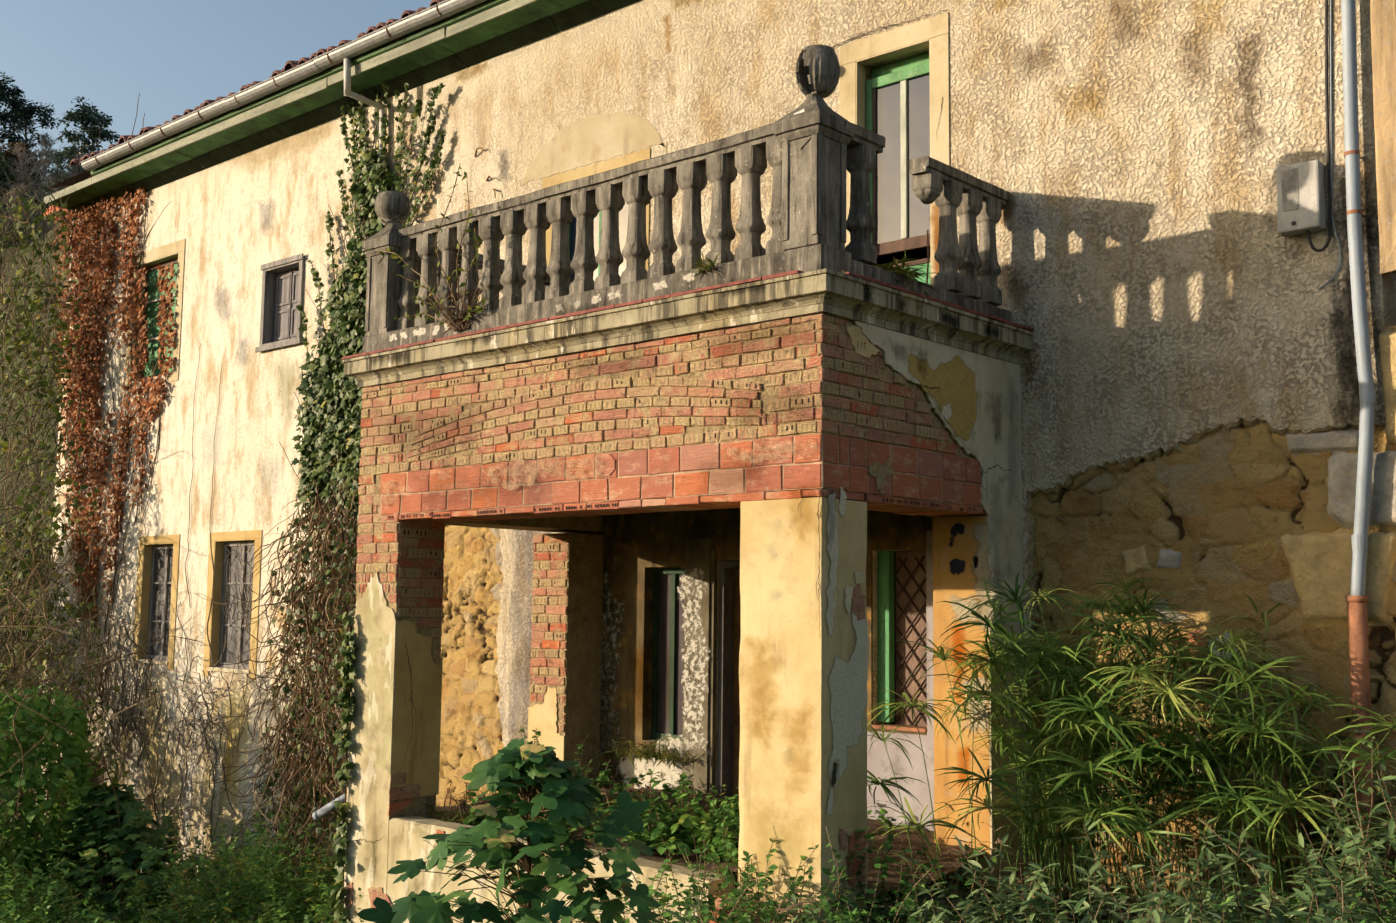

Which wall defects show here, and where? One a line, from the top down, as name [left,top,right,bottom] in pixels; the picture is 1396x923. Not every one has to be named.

spalling [356,313,978,816]
flaking render [826,487,870,887]
flaking render [948,523,996,628]
flaking render [962,677,990,731]
spalling [1025,325,1396,923]